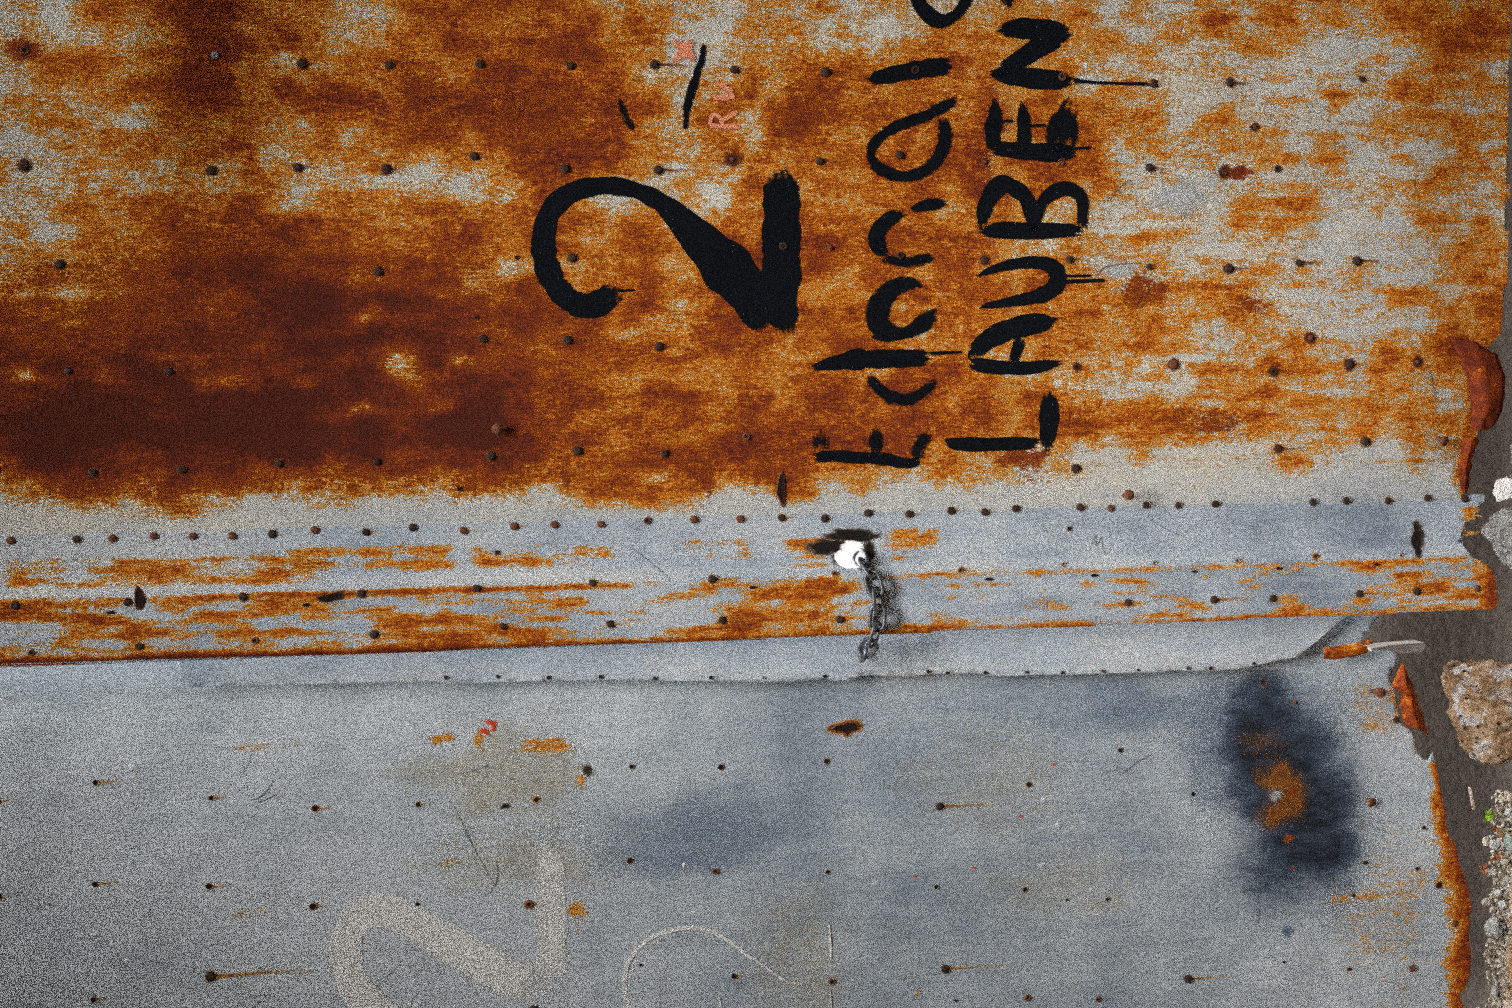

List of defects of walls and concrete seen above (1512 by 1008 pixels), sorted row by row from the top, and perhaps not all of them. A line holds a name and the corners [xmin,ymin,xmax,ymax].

rust [0,0,1511,667]
rust [826,719,863,737]
water stain [1053,669,1362,905]
rust [1317,762,1471,1008]